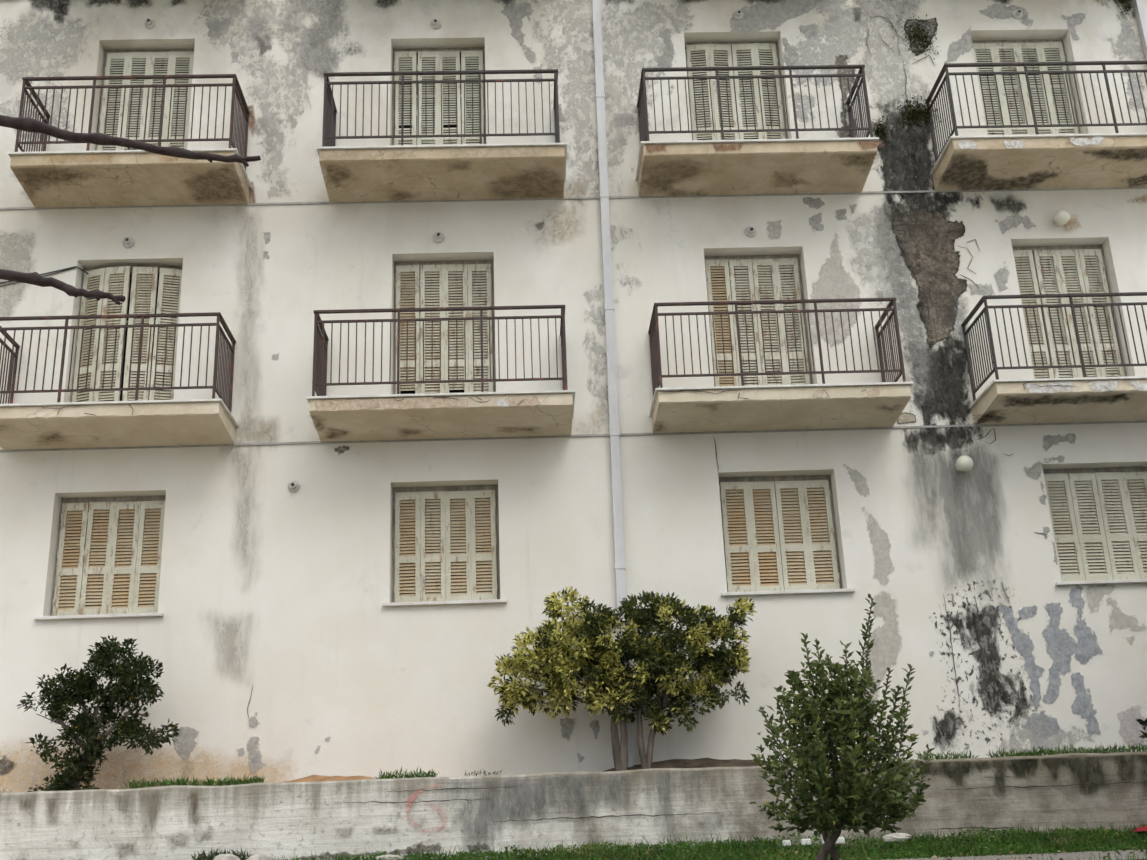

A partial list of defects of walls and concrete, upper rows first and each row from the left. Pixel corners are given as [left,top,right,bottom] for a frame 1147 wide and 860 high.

leakage [199,0,361,196]
peeling [502,3,542,79]
leakage [493,0,700,198]
peeling [730,0,863,138]
spalling [904,17,938,56]
leakage [848,0,1147,793]
peeling [844,465,901,714]
peeling [998,584,1145,738]
peeling [1118,705,1147,746]
leakage [48,798,56,822]
leakage [146,793,159,825]
leakage [189,790,210,839]